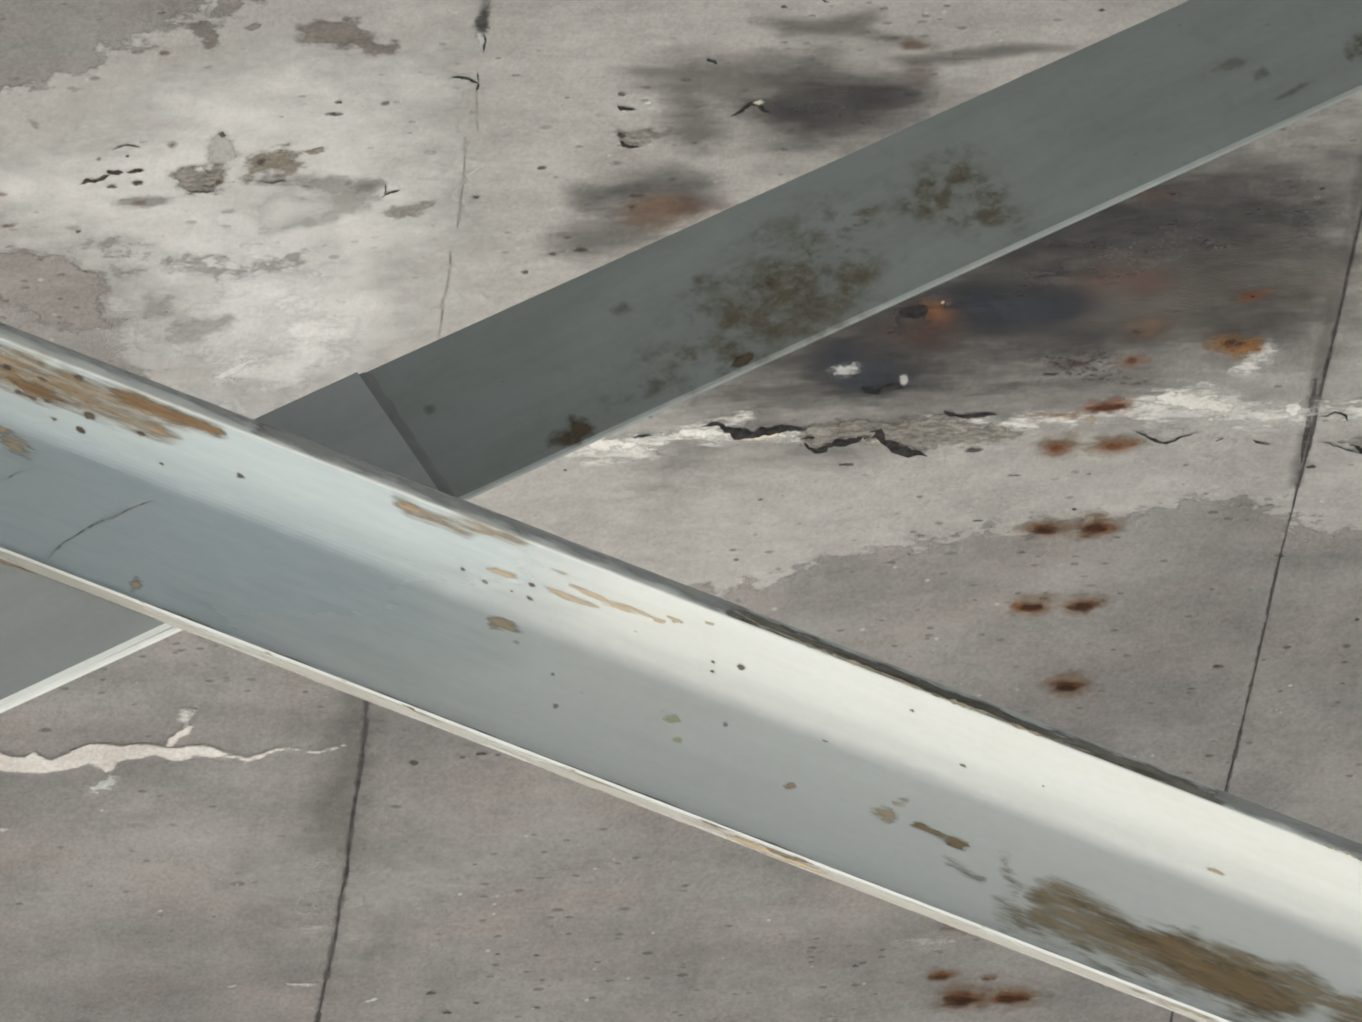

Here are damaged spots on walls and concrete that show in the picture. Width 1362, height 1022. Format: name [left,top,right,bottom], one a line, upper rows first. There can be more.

water stain [0,0,1189,419]
water stain [466,92,1362,598]
corrosion [1214,336,1262,356]
crack [1318,411,1362,454]
corrosion [1023,515,1118,537]
corrosion [1012,597,1051,614]
corrosion [1066,600,1106,612]
corrosion [1048,674,1083,697]
corrosion [930,971,1031,1008]